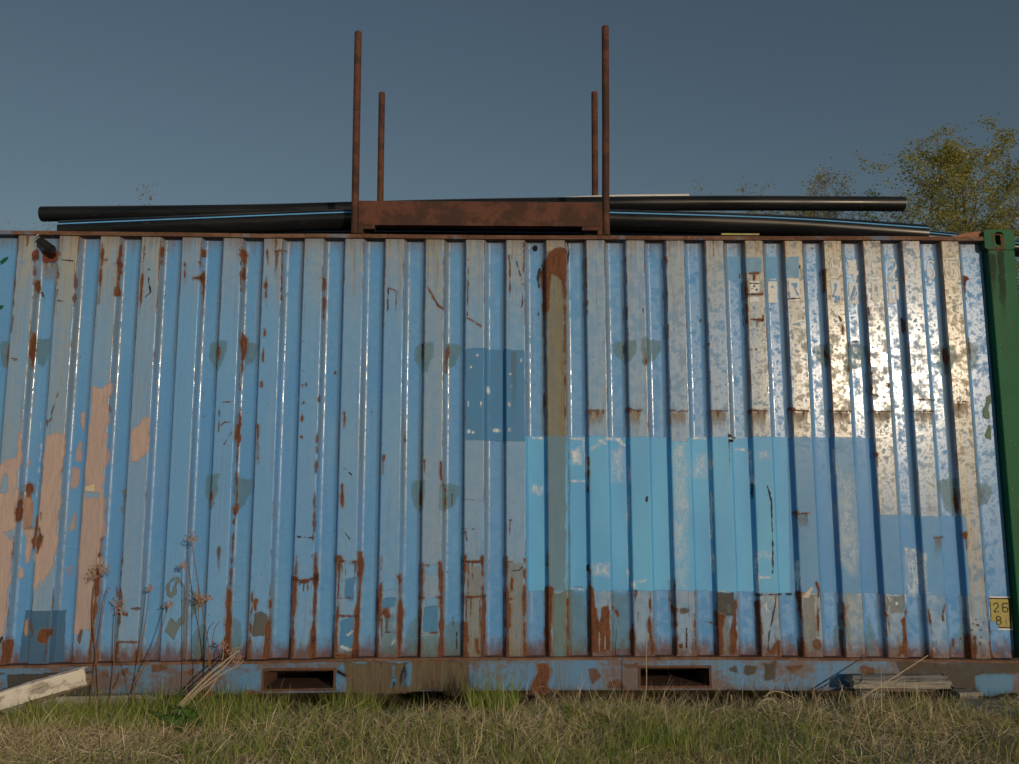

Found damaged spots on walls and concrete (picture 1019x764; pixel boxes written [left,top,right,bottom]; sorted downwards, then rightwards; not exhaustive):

rust [541,247,567,389]
peeling [130,417,151,463]
peeling [0,383,113,638]
rust [217,412,241,660]
rust [247,592,272,659]
rust [289,553,319,659]
rust [334,551,364,658]
rust [420,561,454,657]
rust [544,586,554,656]
rust [586,564,619,653]
rust [669,581,713,656]
rust [754,596,781,657]